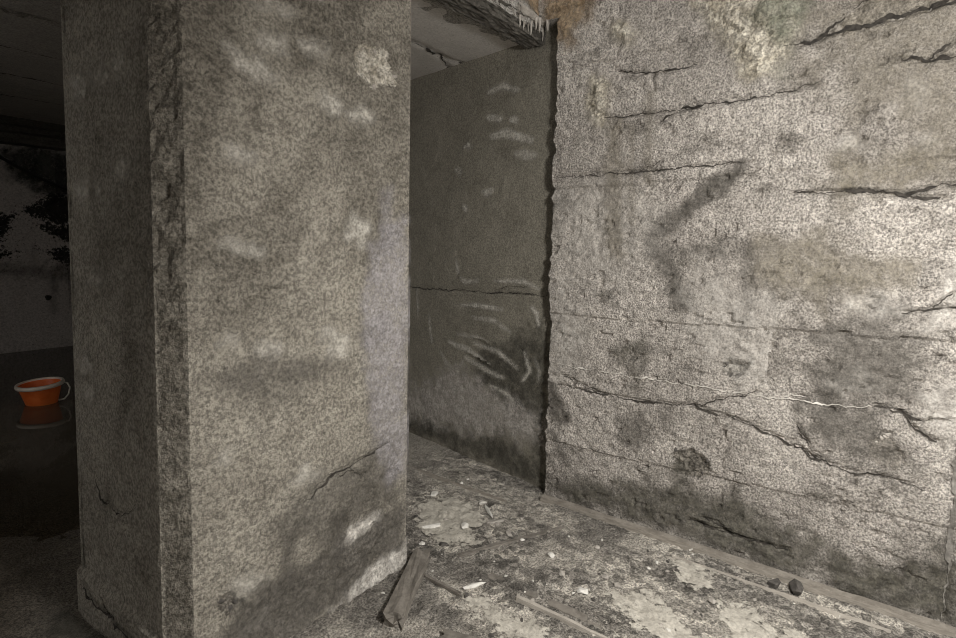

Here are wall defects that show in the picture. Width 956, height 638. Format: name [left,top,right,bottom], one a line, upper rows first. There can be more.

crack [782,0,956,47]
crack [901,43,956,62]
crack [605,64,818,122]
water stain [2,145,68,201]
crack [553,161,742,178]
crack [795,183,956,200]
crack [904,293,956,314]
crack [304,445,383,502]
crack [552,363,956,619]